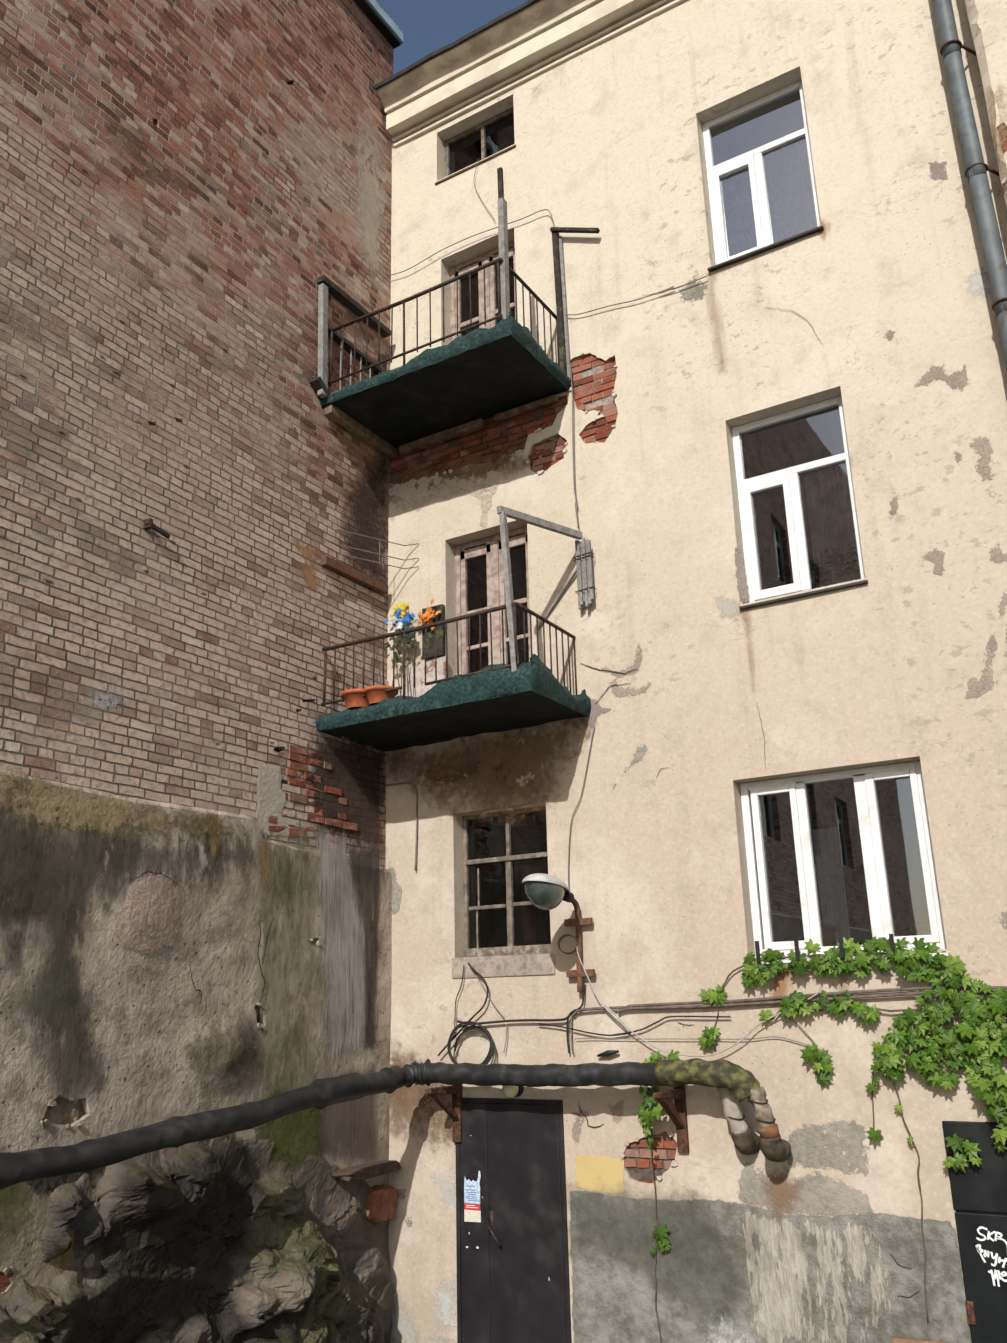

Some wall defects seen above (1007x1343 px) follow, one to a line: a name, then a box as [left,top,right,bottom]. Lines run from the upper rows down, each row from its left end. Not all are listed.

spalling [999,123,1007,155]
peeling [914,364,971,392]
spalling [389,352,618,528]
peeling [964,593,1007,699]
spalling [268,745,358,837]
leakage [0,806,251,1100]
spalling [609,1100,624,1125]
spalling [619,1131,678,1183]